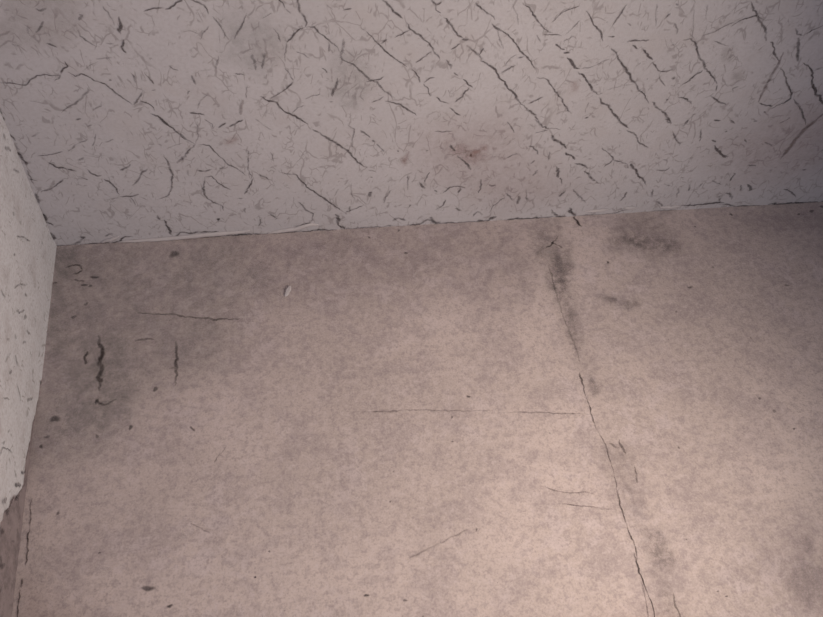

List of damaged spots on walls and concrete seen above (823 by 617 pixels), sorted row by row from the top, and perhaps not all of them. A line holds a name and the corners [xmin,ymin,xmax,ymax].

crack [117,19,126,53]
crack [0,26,268,239]
crack [264,84,306,123]
crack [279,0,330,42]
crack [369,2,646,226]
crack [569,7,734,157]
crack [742,4,823,120]
crack [285,174,372,233]
crack [686,178,804,207]
crack [616,484,655,617]